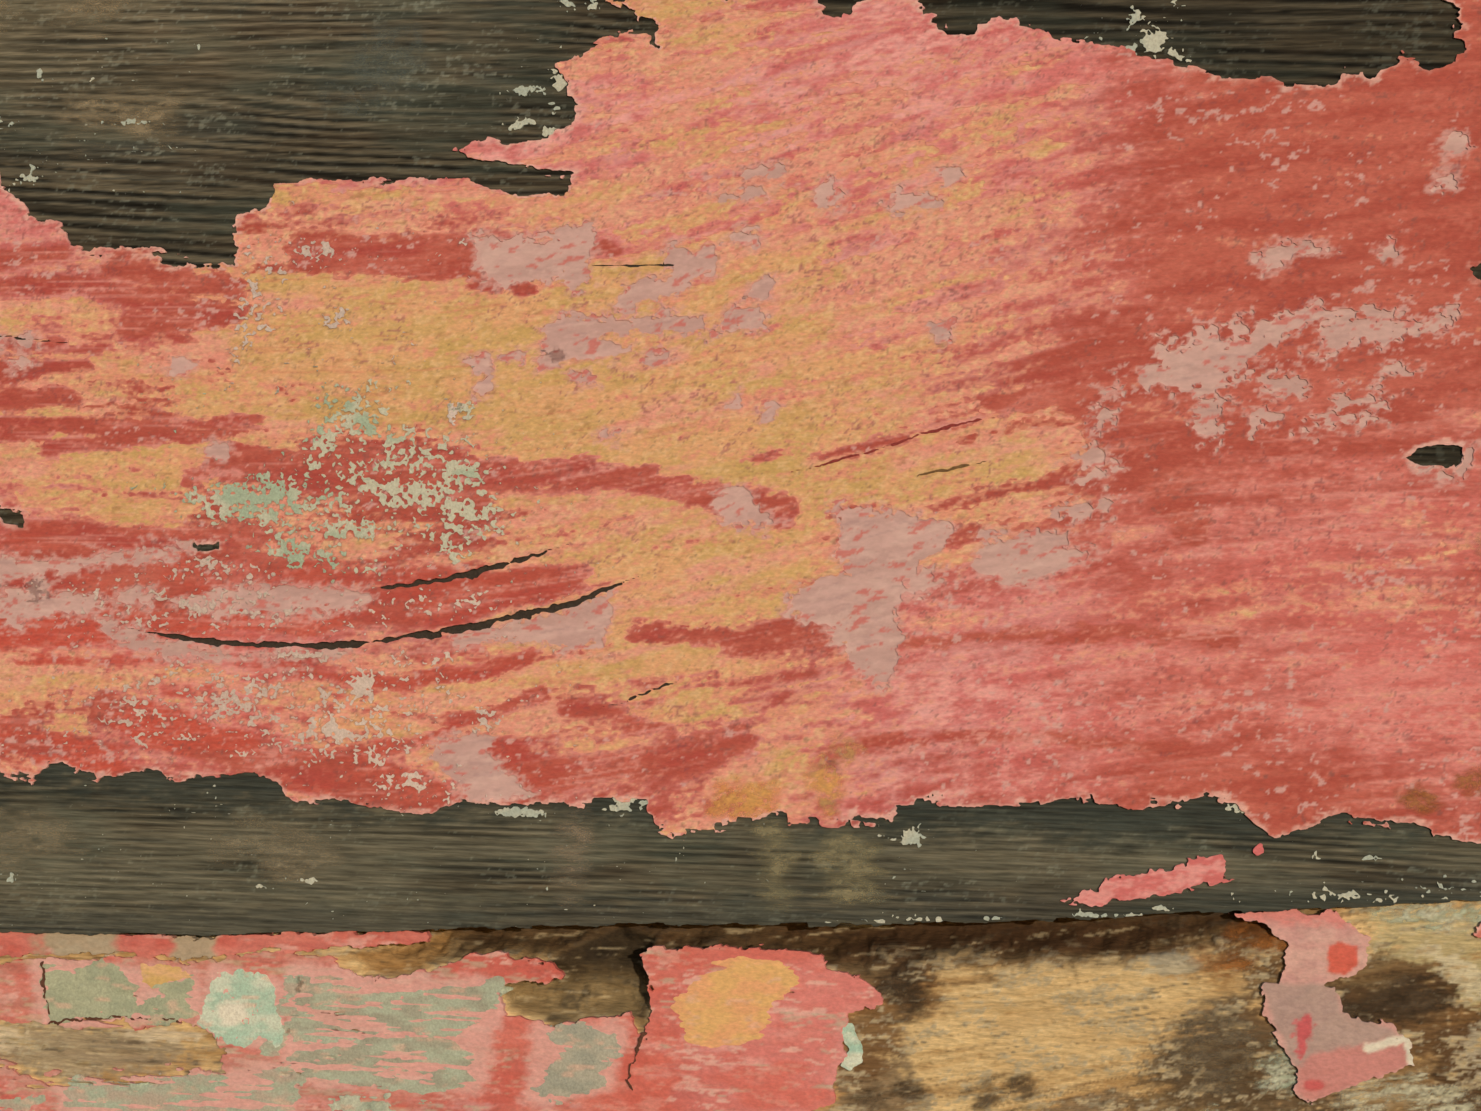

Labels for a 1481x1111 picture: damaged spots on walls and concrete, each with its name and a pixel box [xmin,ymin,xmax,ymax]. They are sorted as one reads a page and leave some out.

peeling [1441,131,1475,154]
peeling [1428,174,1458,195]
peeling [293,238,345,265]
peeling [1470,263,1481,280]
peeling [1406,445,1474,482]
crack [381,544,569,590]
crack [132,576,639,650]
peeling [405,586,442,616]
peeling [451,590,489,621]
peeling [130,708,197,758]